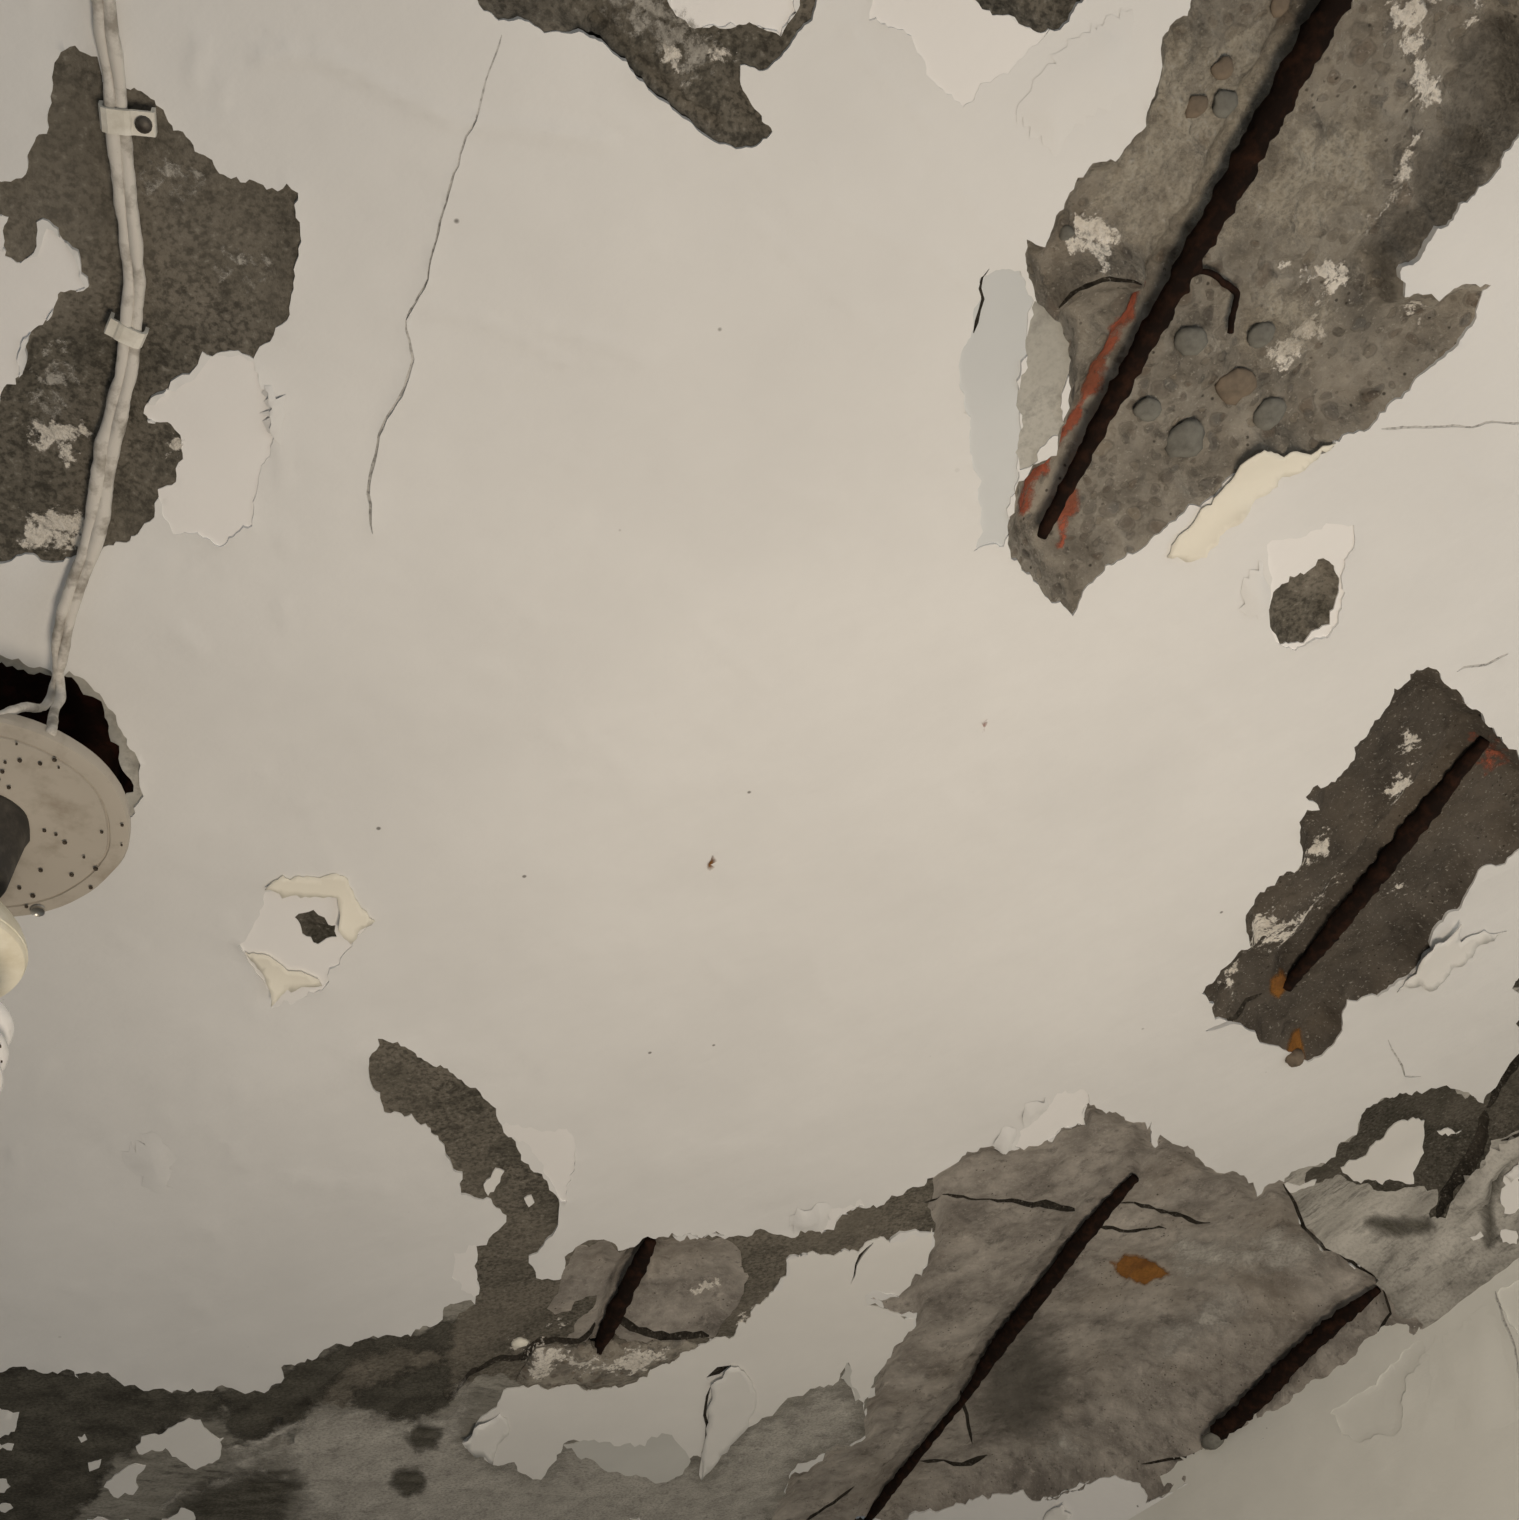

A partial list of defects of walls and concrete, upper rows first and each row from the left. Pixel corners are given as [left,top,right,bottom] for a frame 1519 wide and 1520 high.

peeling [0,46,123,562]
peeling [103,88,301,546]
crack [366,35,502,532]
corrosion [1019,458,1050,514]
corrosion [1058,490,1078,548]
corrosion [1060,284,1145,442]
spalling [1007,0,1519,614]
spalling [1203,667,1519,1061]
water stain [0,1318,857,1520]
water stain [690,1277,722,1295]
spalling [63,1039,1519,1520]
corrosion [1111,1255,1168,1285]